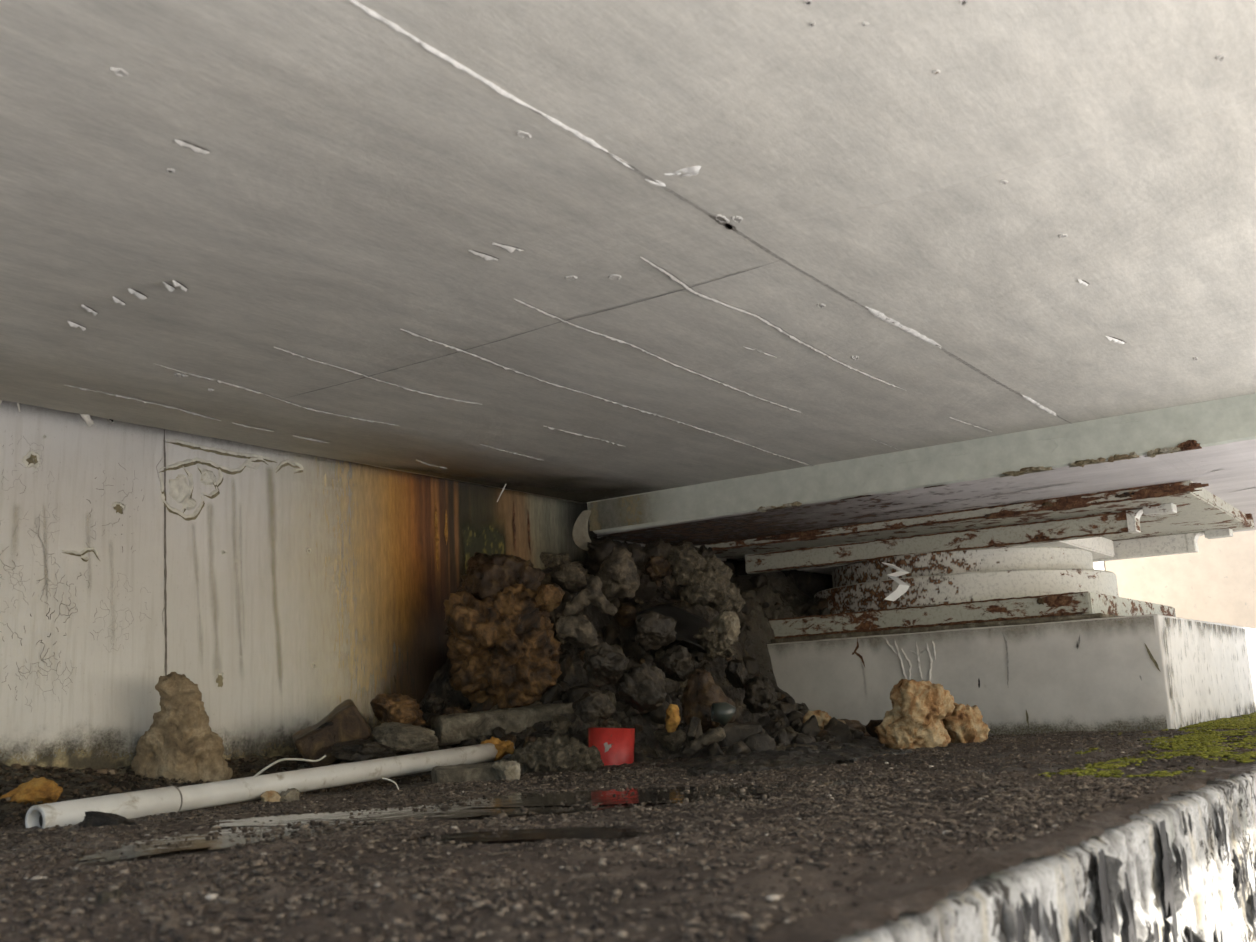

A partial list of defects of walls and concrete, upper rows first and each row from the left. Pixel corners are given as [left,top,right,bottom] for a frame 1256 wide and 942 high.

corrosion [332,460,1209,726]